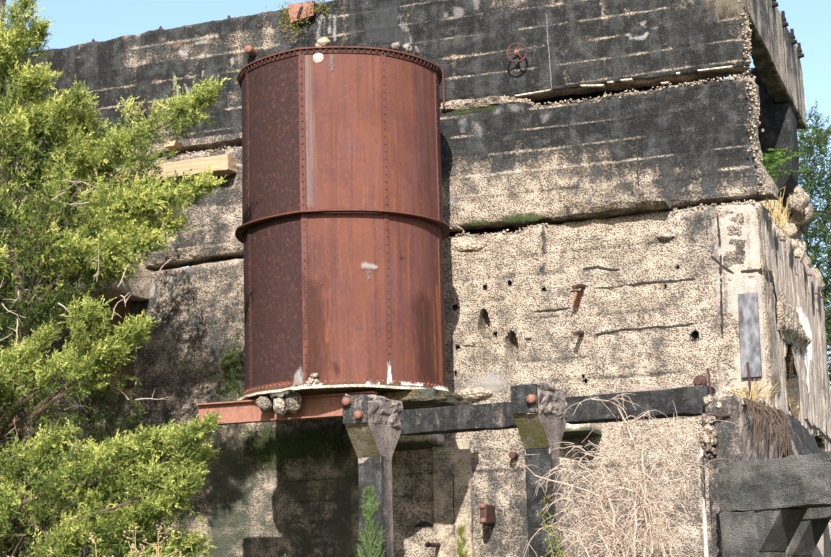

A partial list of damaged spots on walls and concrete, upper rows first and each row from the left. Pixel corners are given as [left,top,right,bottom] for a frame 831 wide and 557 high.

spalling [737,0,769,204]
spalling [774,228,825,320]
rust [415,286,442,383]
spalling [775,291,812,355]